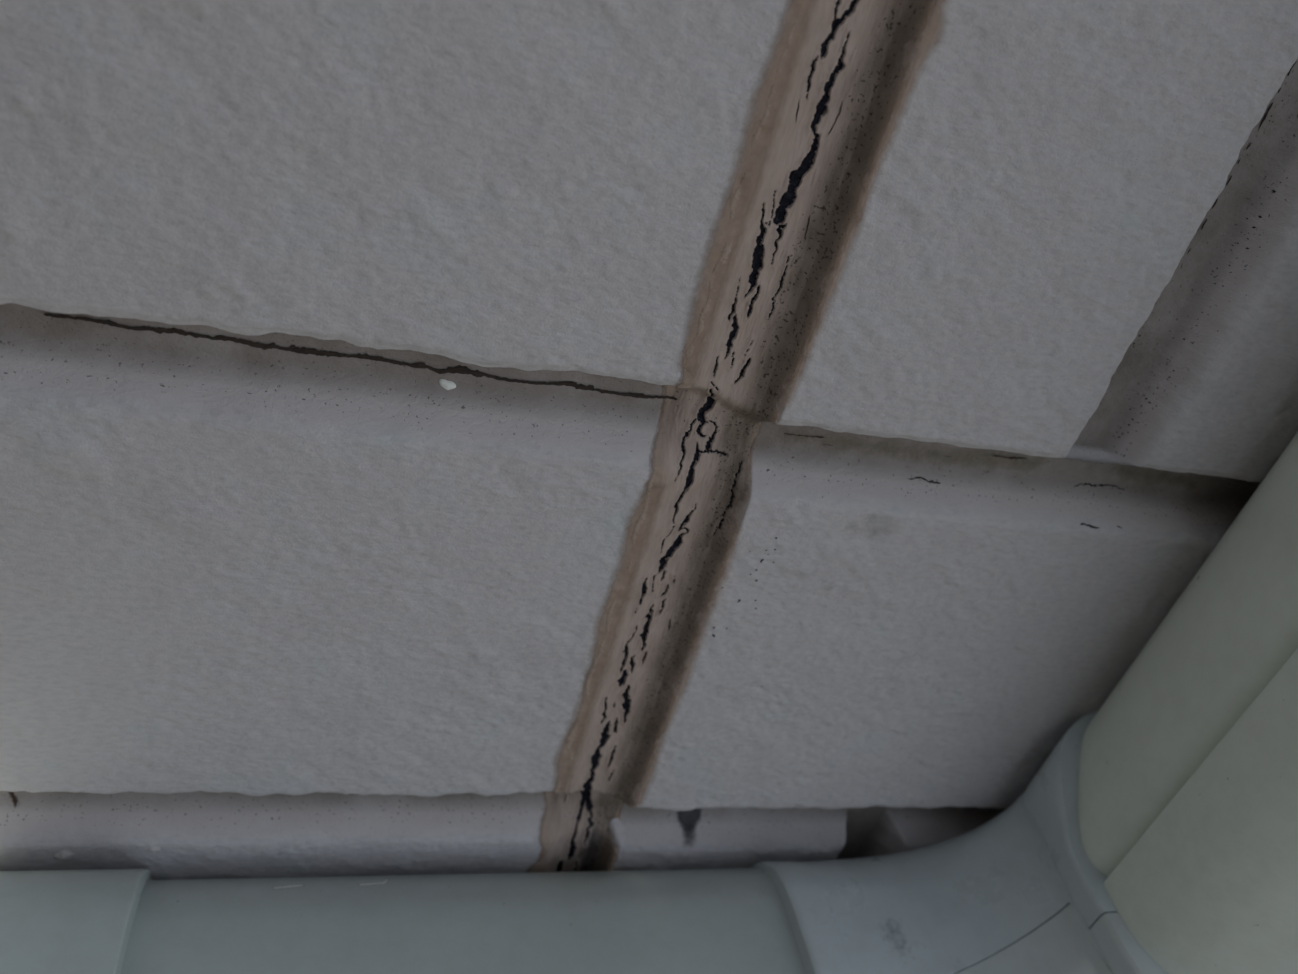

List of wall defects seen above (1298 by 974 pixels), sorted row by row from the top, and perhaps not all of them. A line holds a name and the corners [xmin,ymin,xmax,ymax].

water stain [1226,60,1297,185]
crack [556,0,858,872]
water stain [678,808,701,843]